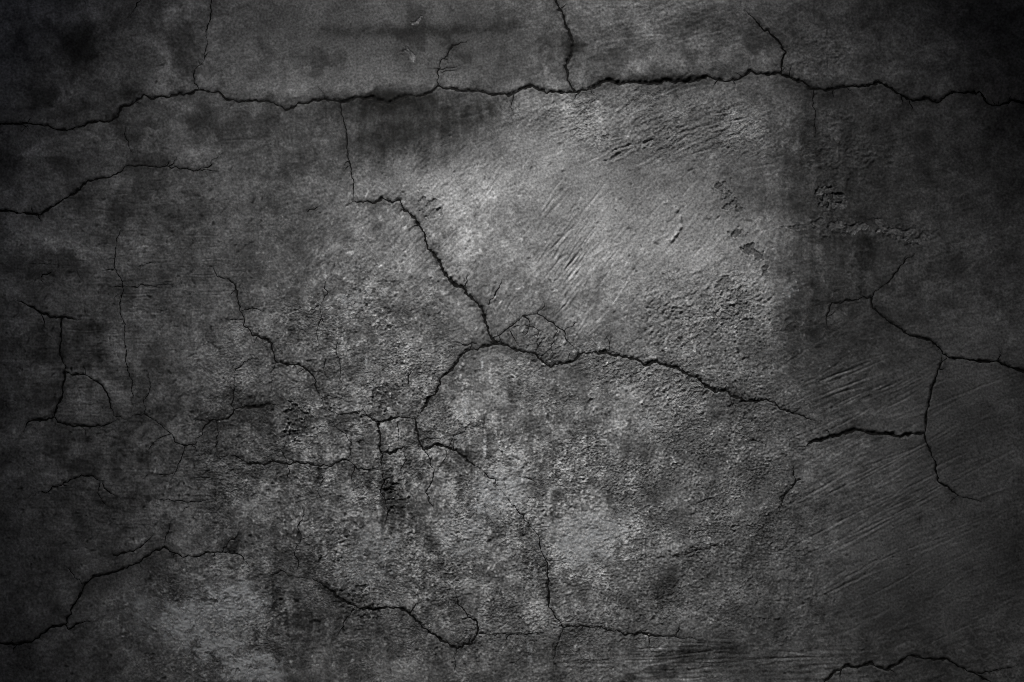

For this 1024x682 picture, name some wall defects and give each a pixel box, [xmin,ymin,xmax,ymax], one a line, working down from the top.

crack [0,0,1024,524]
crack [0,499,540,669]
crack [535,531,705,666]
crack [824,655,1017,682]